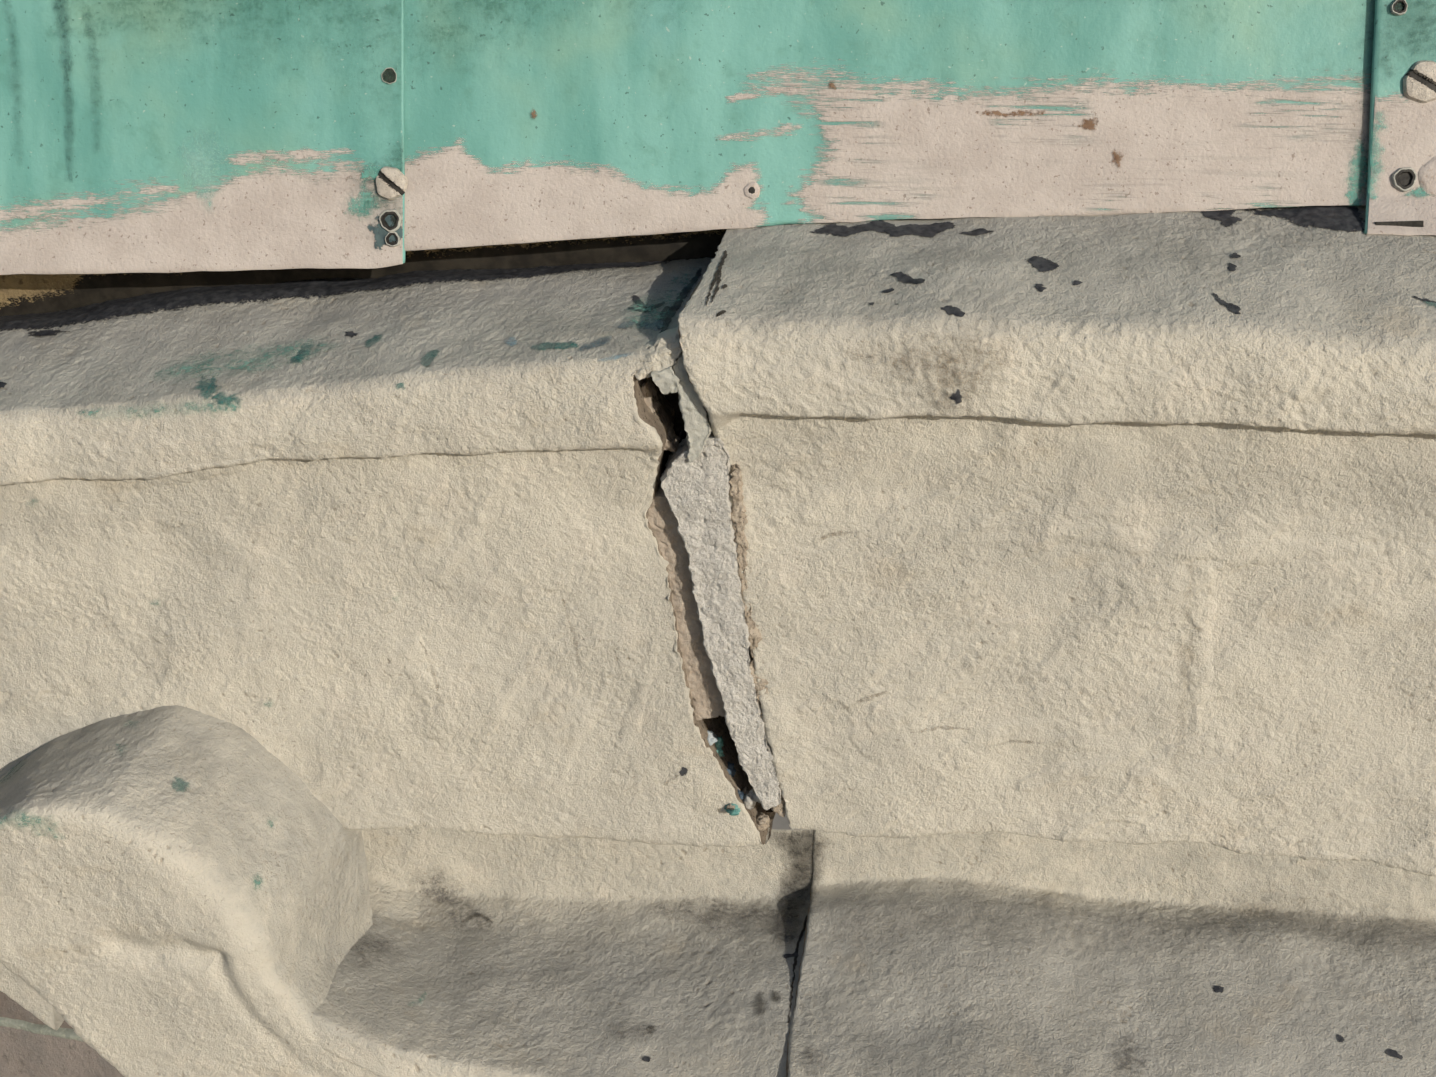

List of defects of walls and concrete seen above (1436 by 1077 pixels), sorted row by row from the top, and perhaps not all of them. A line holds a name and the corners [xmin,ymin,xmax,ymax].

crack [634,250,728,473]
crack [728,464,786,817]
crack [783,916,807,1023]